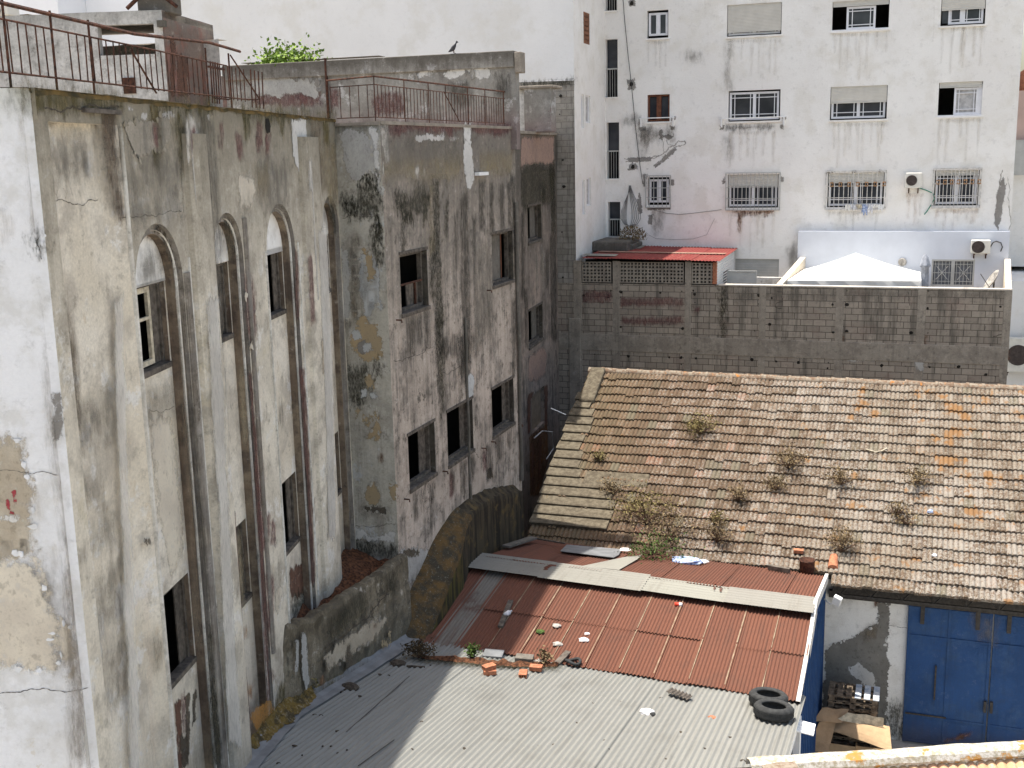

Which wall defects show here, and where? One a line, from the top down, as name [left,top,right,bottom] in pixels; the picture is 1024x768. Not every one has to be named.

peeling [415,129,459,142]
peeling [341,248,384,441]
damp [295,92,556,540]
peeling [0,435,76,679]
damp [299,368,316,582]
crack [0,687,86,695]